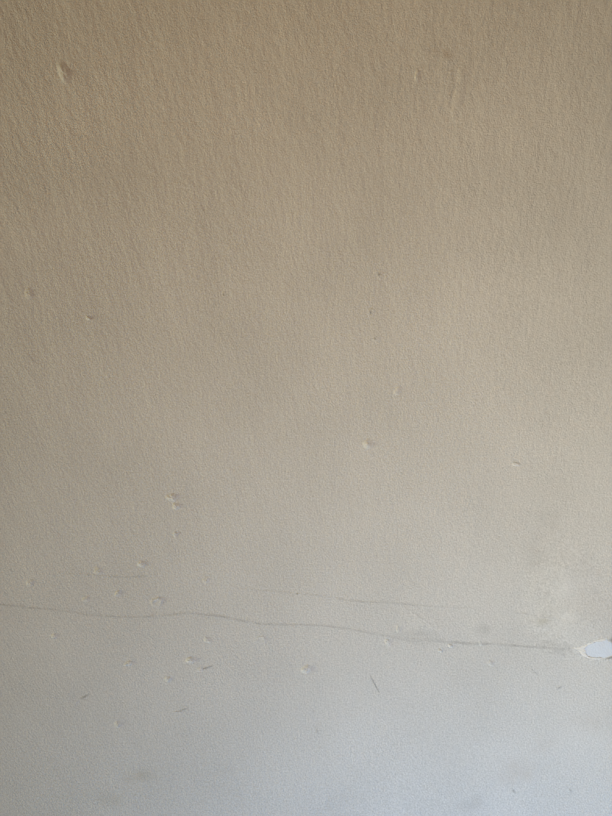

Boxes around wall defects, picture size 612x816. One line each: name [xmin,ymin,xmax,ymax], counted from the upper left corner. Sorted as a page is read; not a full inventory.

crack [0,603,579,657]
peeling [571,630,612,669]